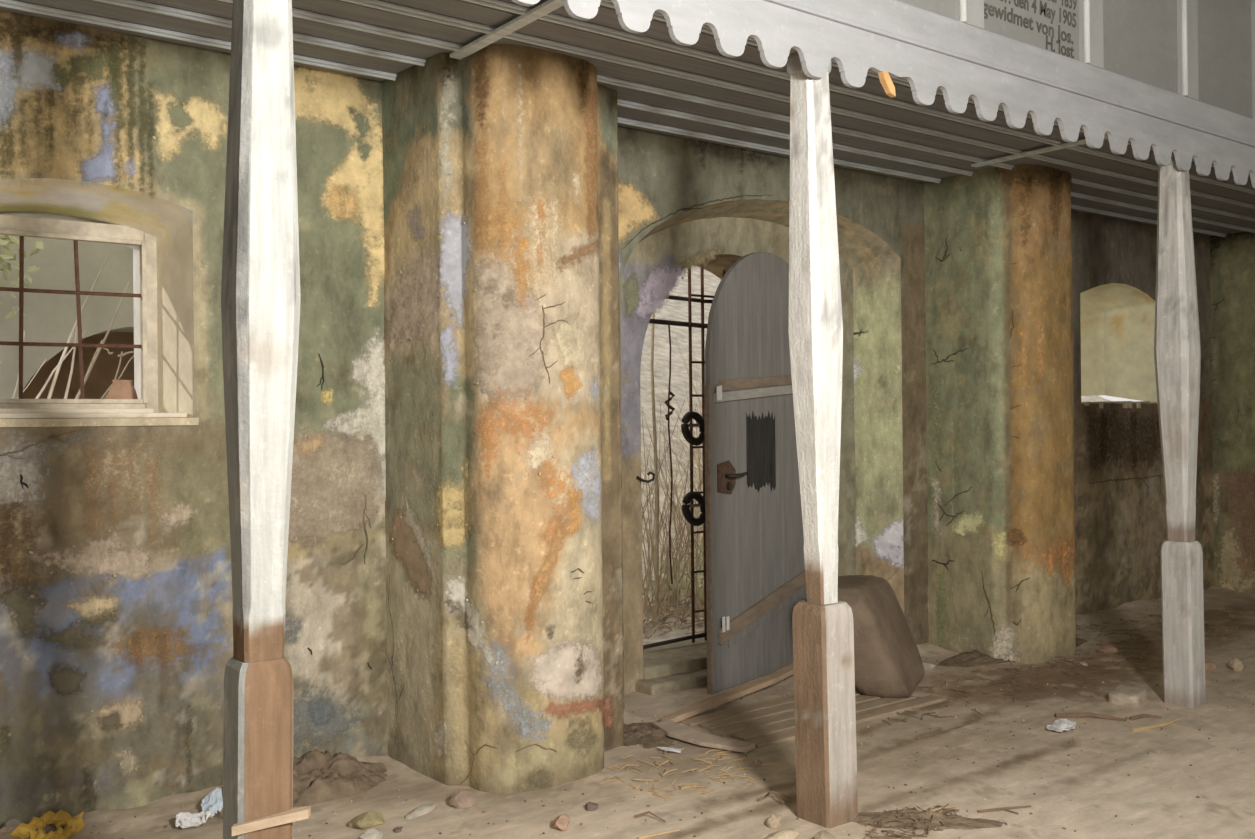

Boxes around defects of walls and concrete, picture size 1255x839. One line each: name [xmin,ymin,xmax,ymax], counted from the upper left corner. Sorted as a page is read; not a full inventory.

peeling [0,31,86,130]
damp [0,12,154,196]
peeling [81,84,136,184]
peeling [294,66,586,402]
corrosion [560,367,581,399]
damp [0,495,40,594]
peeling [0,529,153,652]
flaking render [288,432,380,547]
flaking render [389,449,614,739]
peeling [519,429,556,475]
corrosion [526,461,583,630]
peeling [855,516,904,568]